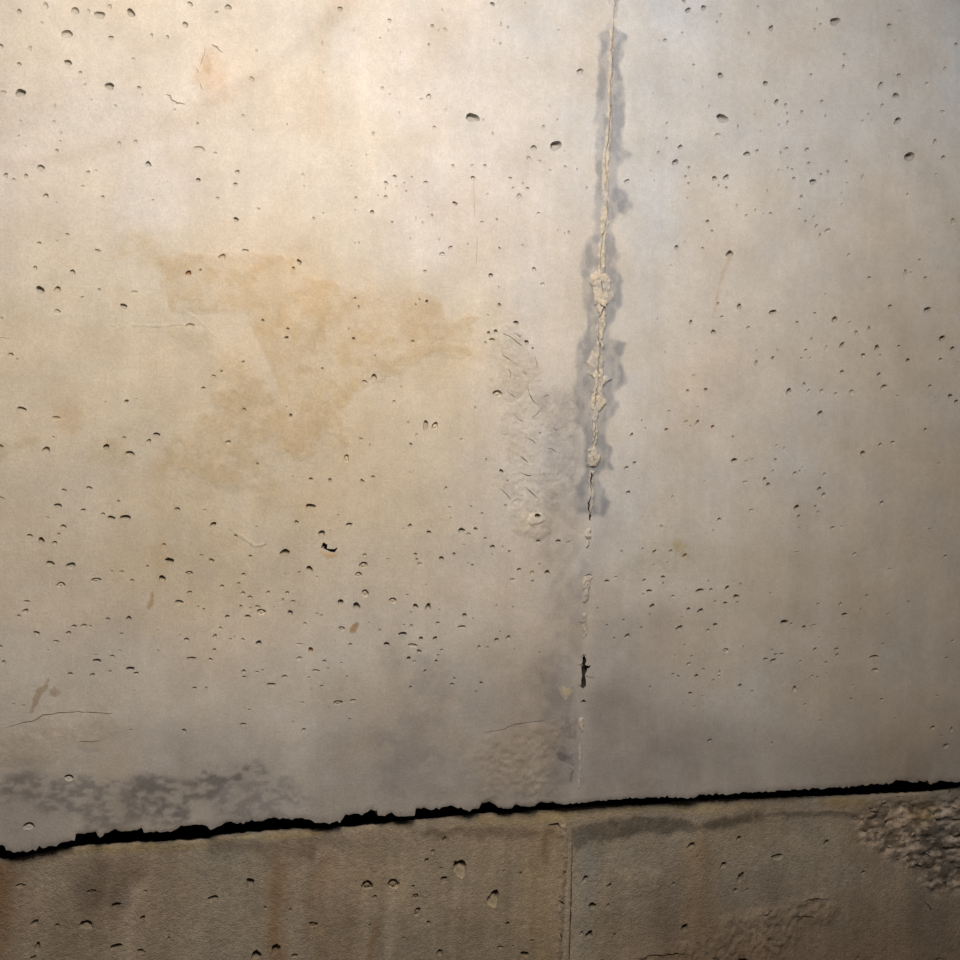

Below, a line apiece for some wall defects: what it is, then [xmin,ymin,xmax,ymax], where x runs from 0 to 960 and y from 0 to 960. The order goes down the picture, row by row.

crack [600,0,616,253]
crack [592,282,604,448]
water stain [356,0,872,865]
crack [578,654,593,702]
water stain [0,753,356,960]
water stain [358,873,466,960]
crack [0,780,960,960]
spalling [847,789,960,903]